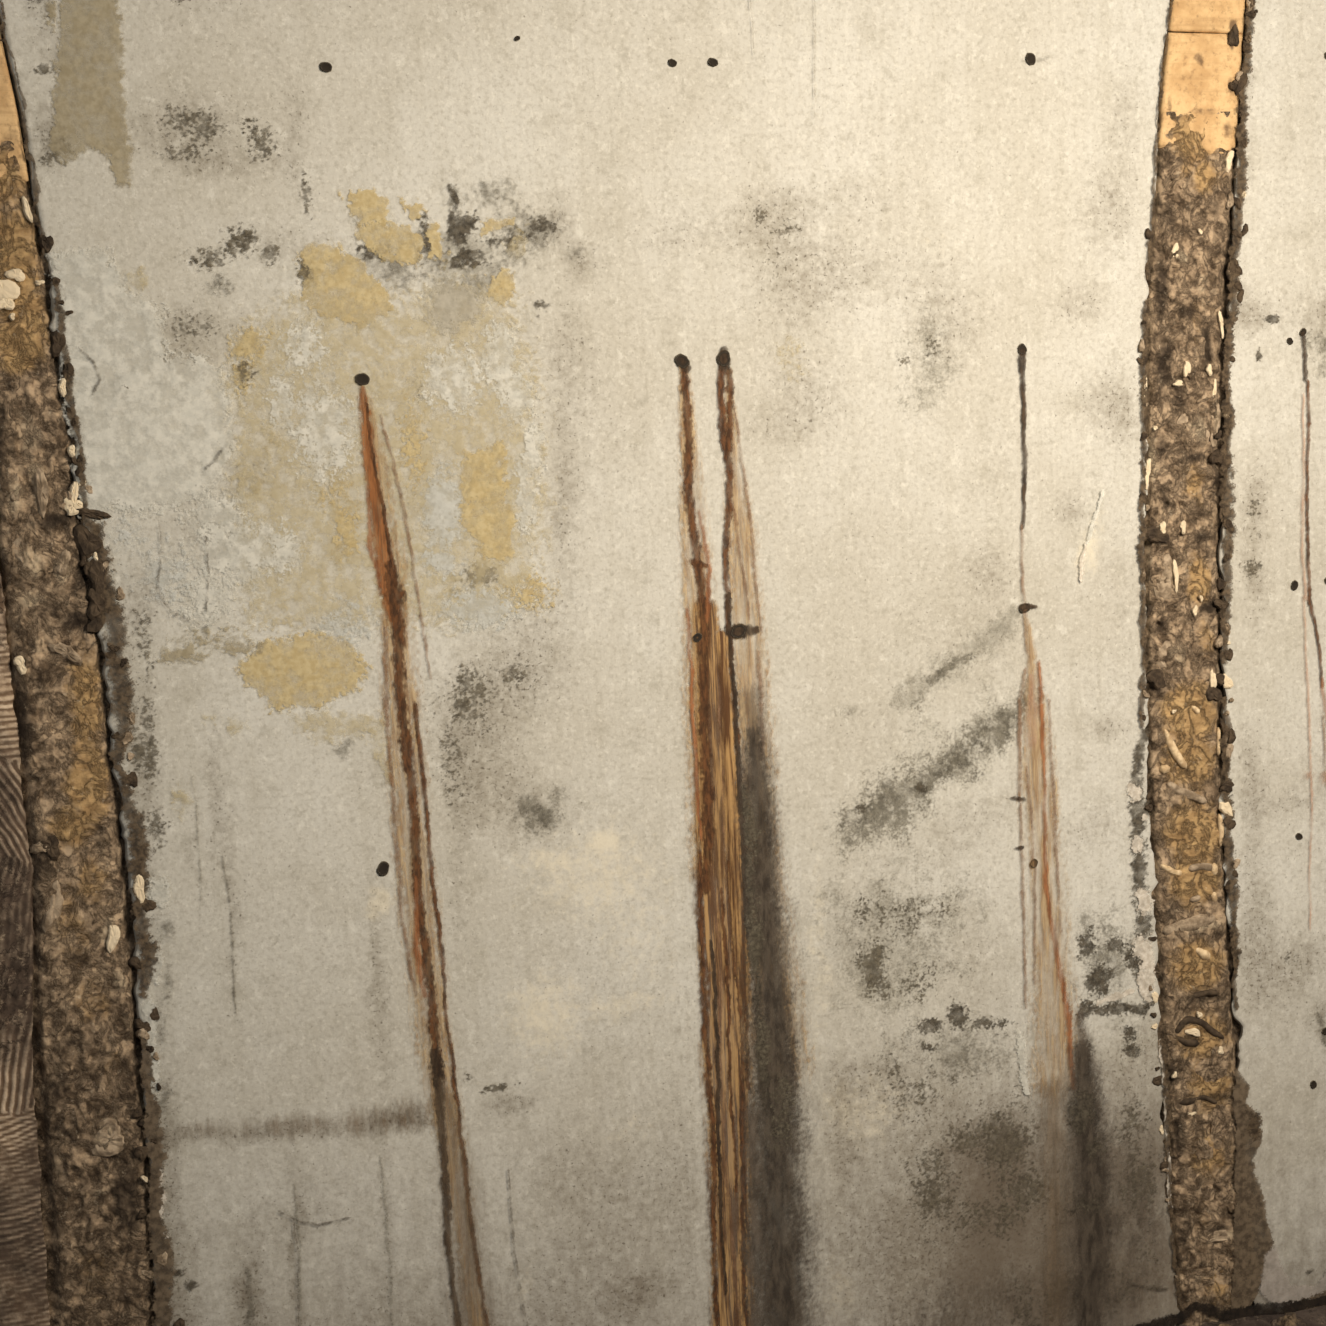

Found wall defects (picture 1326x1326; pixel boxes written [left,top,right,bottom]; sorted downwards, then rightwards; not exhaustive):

damp [190,227,280,285]
peeling [0,0,559,1326]
rust [360,386,490,1326]
rust [679,346,785,1326]
damp [741,708,814,1326]
damp [855,890,962,1003]
damp [869,925,1163,1326]
rust [1018,349,1028,534]
spalling [1126,299,1186,1009]
spalling [1146,0,1174,280]
spalling [1230,1068,1274,1320]
rust [1301,331,1324,689]